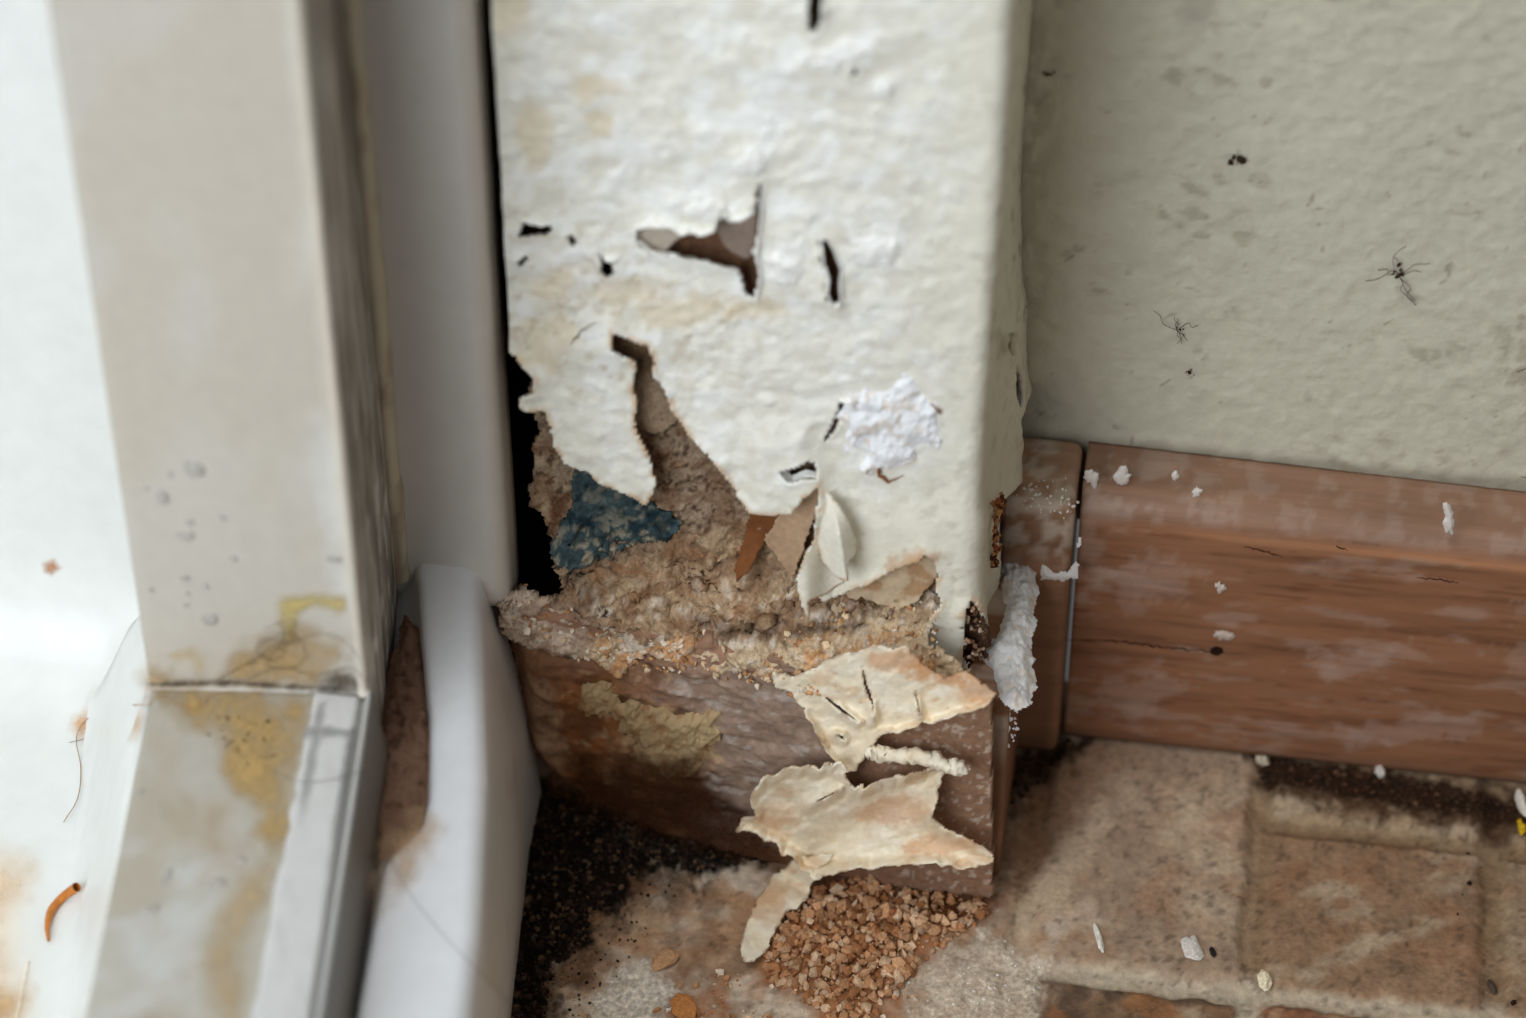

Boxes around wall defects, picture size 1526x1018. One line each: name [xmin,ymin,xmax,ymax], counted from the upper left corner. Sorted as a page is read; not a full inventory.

crack [809,0,826,31]
spalling [665,184,761,296]
water stain [835,372,943,476]
water stain [1016,478,1079,519]
flaking render [496,411,996,963]
water stain [982,537,1094,815]